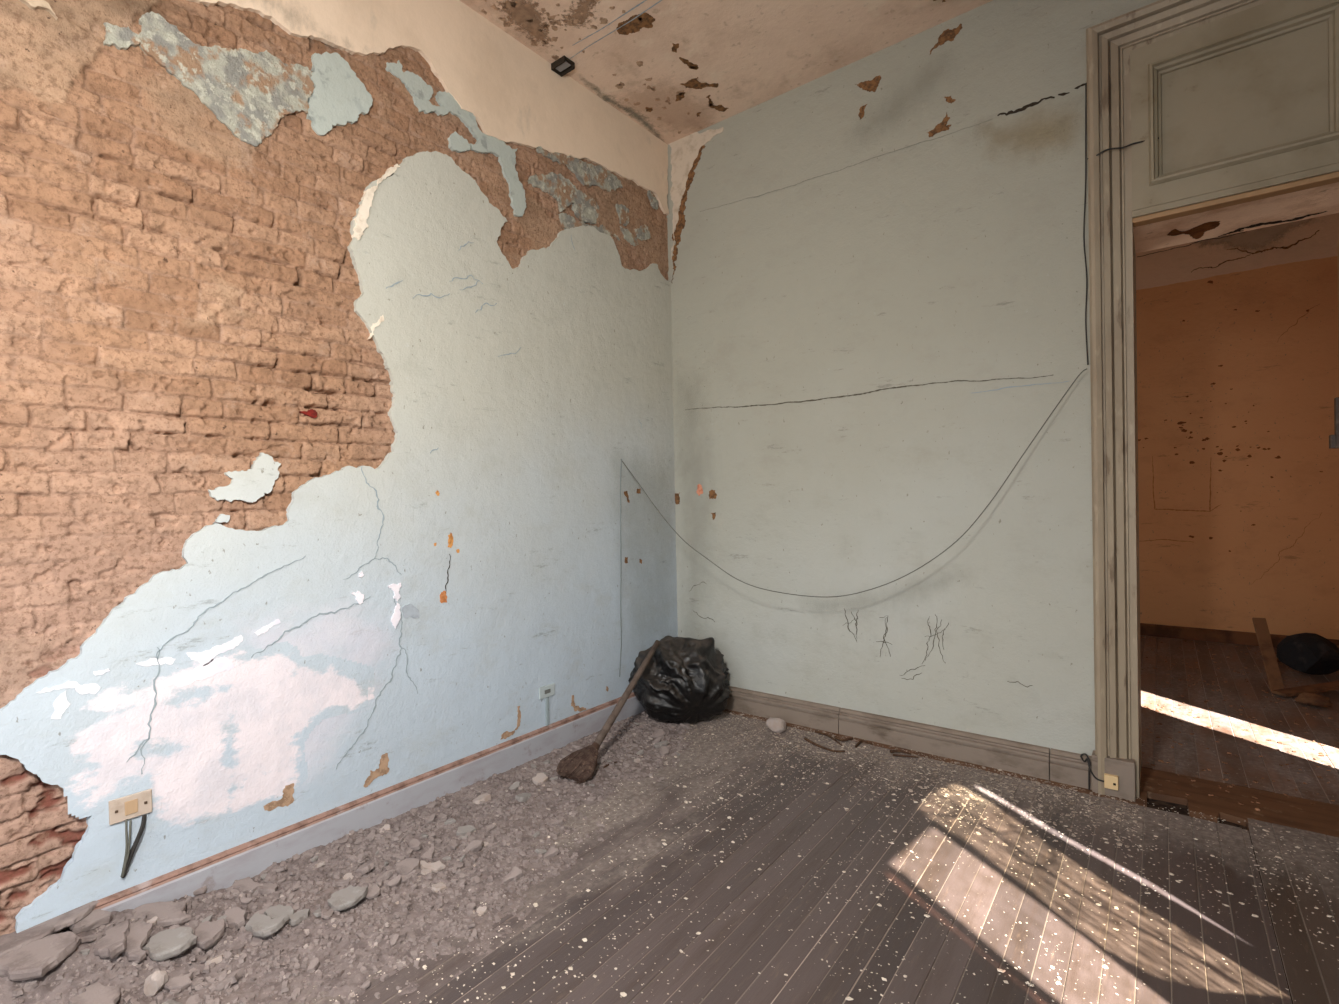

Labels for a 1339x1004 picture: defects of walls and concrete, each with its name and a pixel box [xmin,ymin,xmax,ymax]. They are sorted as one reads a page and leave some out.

damp [497,0,596,44]
peeling [930,24,962,54]
peeling [612,43,728,120]
peeling [855,75,881,119]
crack [700,83,1085,212]
peeling [928,96,955,137]
peeling [1167,221,1220,239]
crack [1138,211,1327,273]
crack [686,375,1068,410]
flaking render [0,0,706,936]
crack [251,467,418,769]
crack [127,556,305,774]